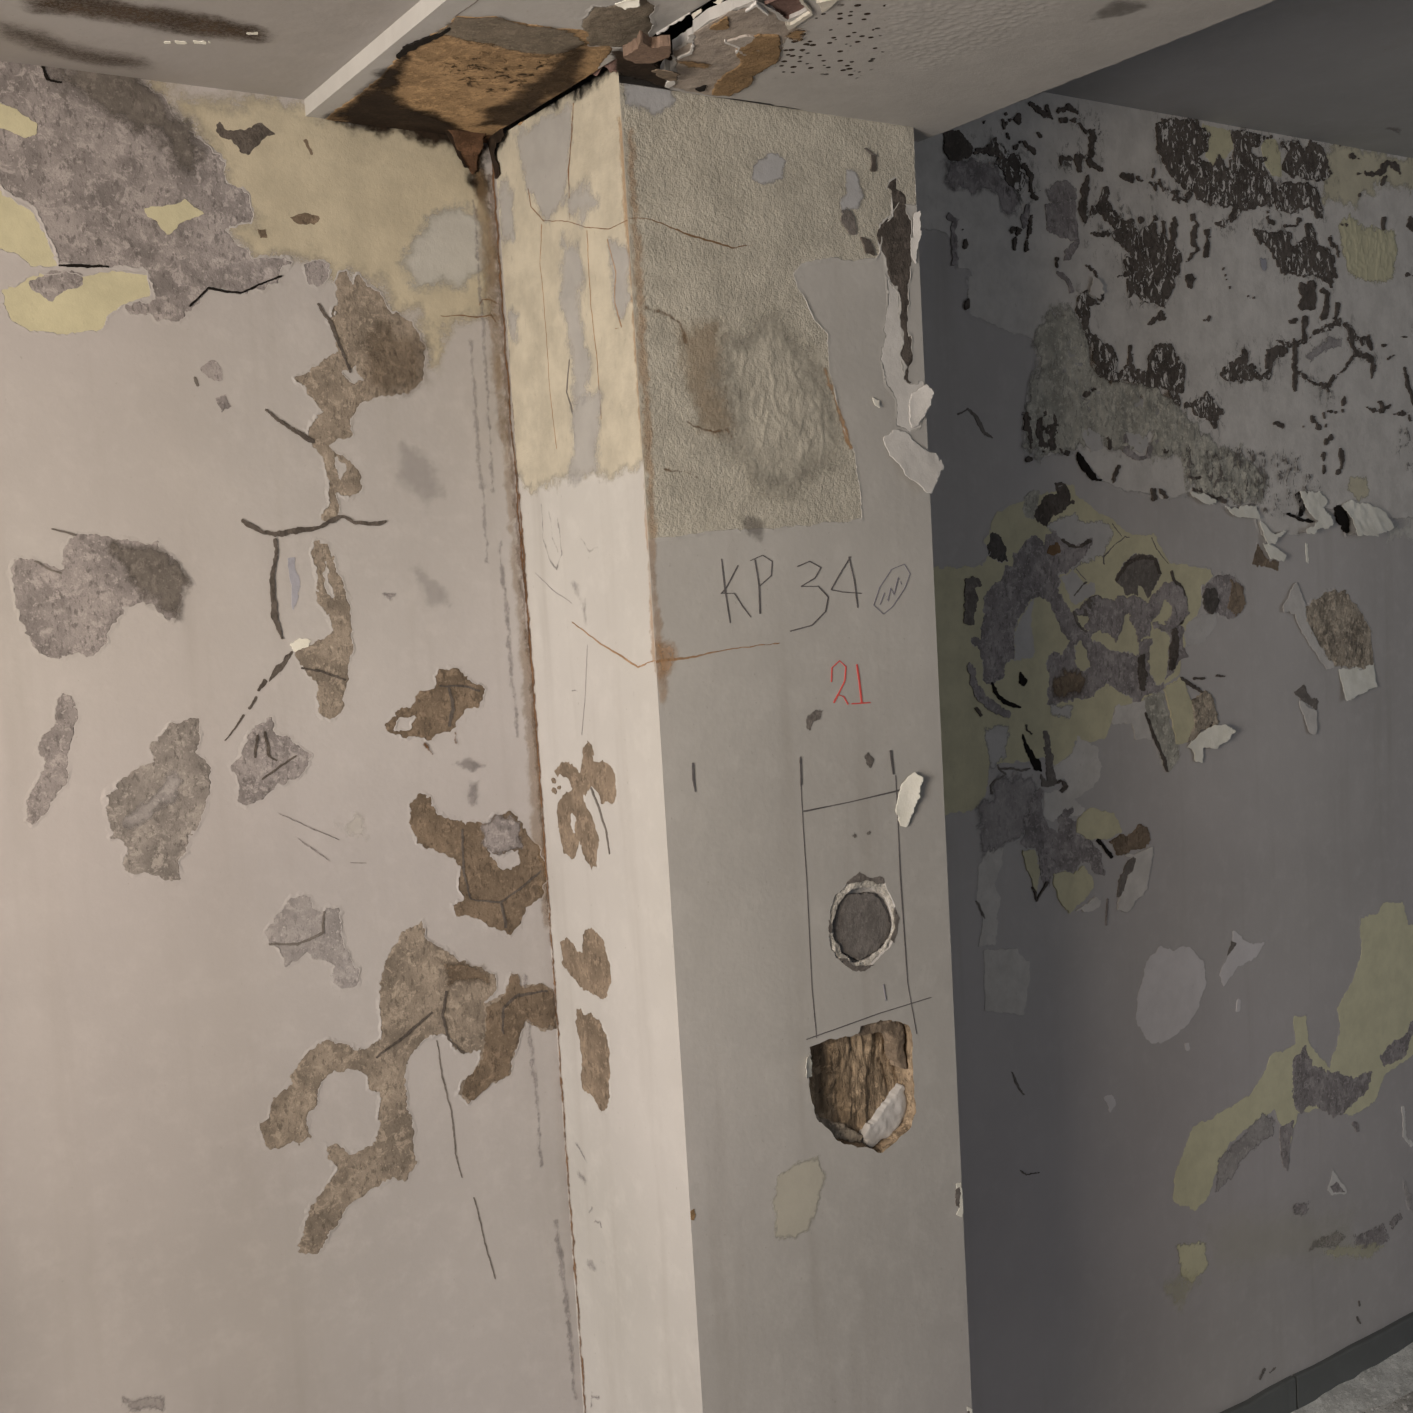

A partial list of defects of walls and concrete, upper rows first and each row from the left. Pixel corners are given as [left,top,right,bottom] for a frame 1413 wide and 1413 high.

water stain [29,0,267,45]
water stain [325,55,460,146]
water stain [442,48,584,201]
flaking render [0,61,430,723]
peeling [840,92,1413,573]
crack [224,651,293,741]
flaking render [963,482,1246,925]
flaking render [100,714,314,885]
flaking render [404,789,547,939]
flaking render [551,737,619,874]
flaking render [253,889,557,1259]
spalling [805,1020,916,1153]